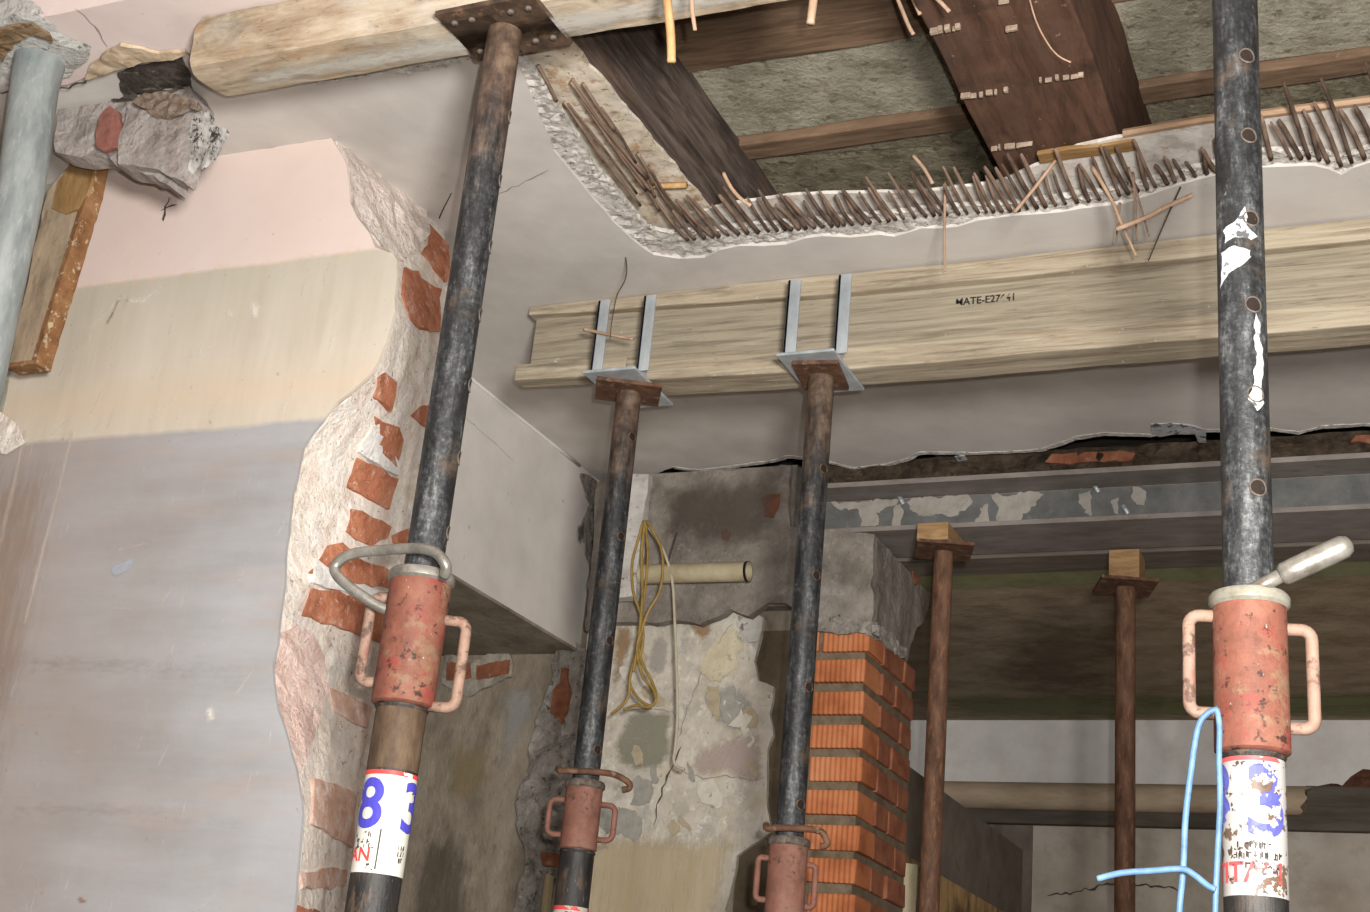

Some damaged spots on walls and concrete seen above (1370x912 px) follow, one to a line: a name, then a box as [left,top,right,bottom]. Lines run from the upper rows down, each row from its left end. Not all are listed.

spalling [54,42,230,199]
spalling [518,42,1215,258]
spalling [1261,61,1370,173]
spalling [340,147,451,333]
peeling [831,488,1092,527]
spalling [828,423,1221,483]
spalling [1270,423,1370,458]
spalling [275,372,429,848]
peeling [736,615,763,643]
flaking render [513,642,587,912]
flaking render [599,745,659,843]
spalling [296,867,347,912]